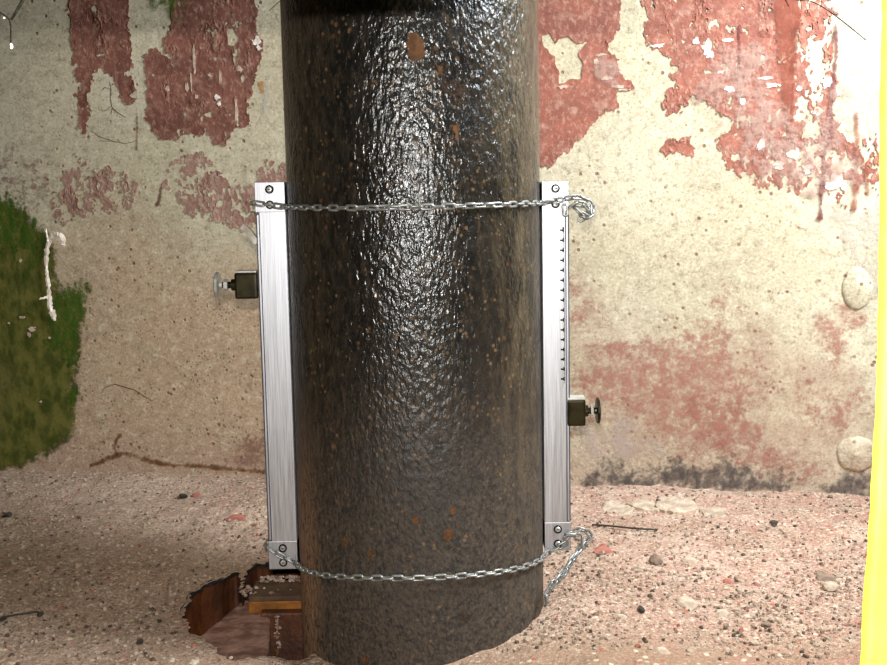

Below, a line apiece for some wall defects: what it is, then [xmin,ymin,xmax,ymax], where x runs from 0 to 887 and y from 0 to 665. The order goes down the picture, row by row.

peeling [66,0,263,147]
rust [406,32,425,61]
peeling [538,0,635,168]
peeling [641,0,879,210]
peeling [160,151,286,232]
water stain [575,322,815,492]
water stain [822,471,871,496]